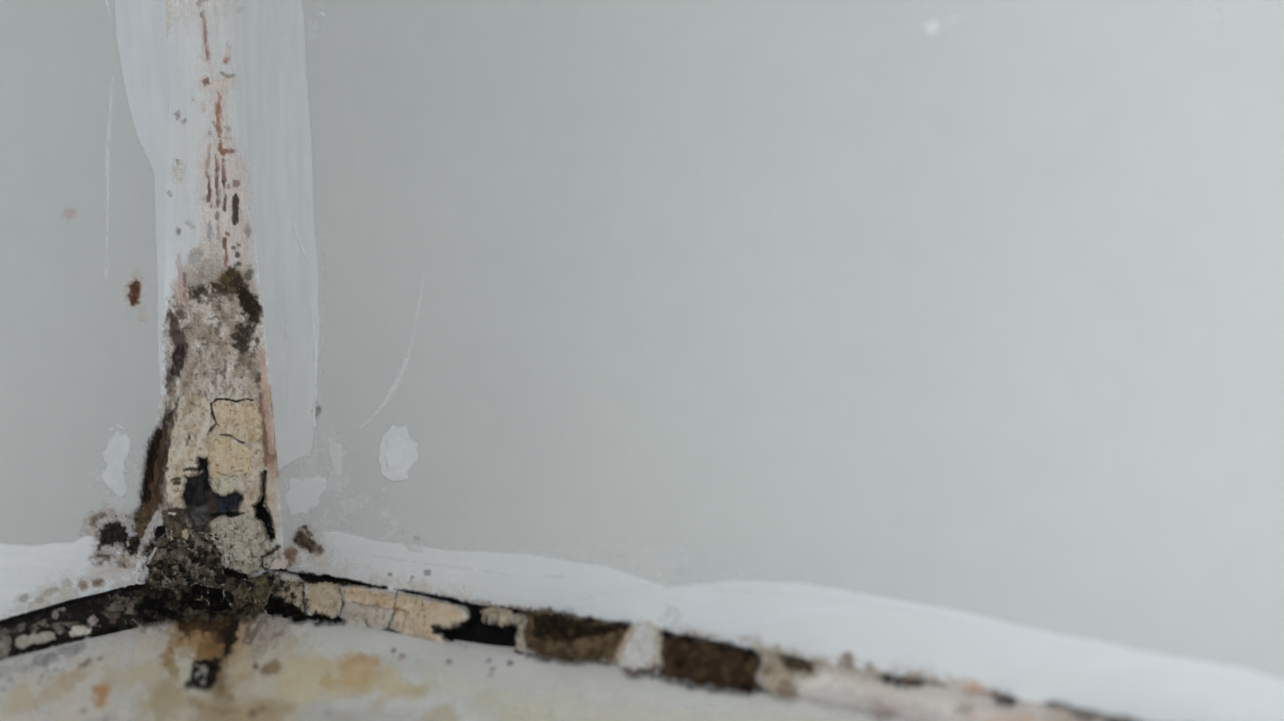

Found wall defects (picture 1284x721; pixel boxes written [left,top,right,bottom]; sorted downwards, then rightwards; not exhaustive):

rust [198,11,254,269]
rust [127,275,144,320]
damp [131,221,273,523]
peeling [0,607,98,659]
peeling [105,386,527,655]
crack [186,391,566,634]
damp [0,525,1017,721]
peeling [617,619,661,677]